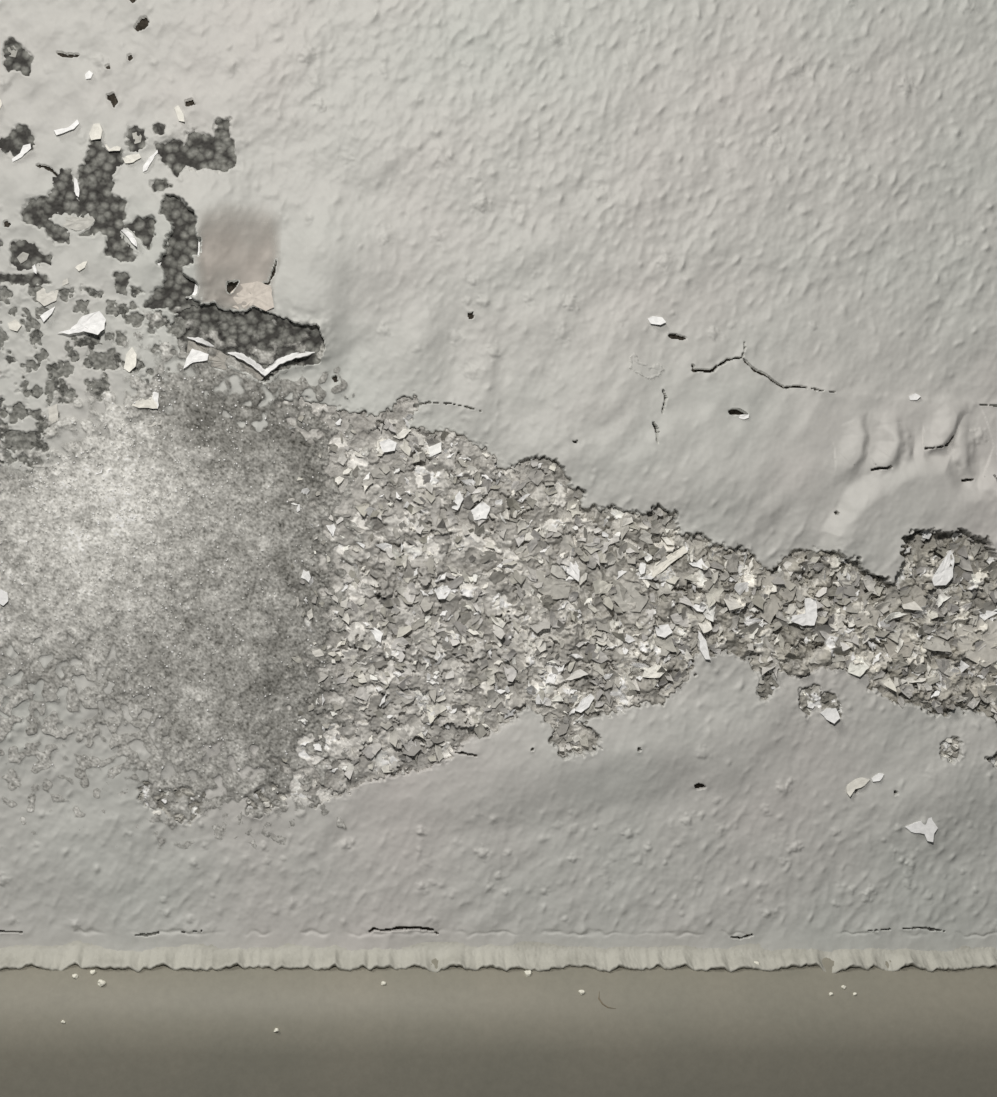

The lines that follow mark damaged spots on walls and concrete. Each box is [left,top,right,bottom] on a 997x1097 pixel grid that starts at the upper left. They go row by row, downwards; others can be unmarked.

peeling [3,37,34,76]
peeling [0,100,325,486]
crack [668,333,685,341]
crack [691,347,832,393]
leakage [0,321,378,849]
flaking render [245,396,997,818]
flaking render [138,782,206,824]